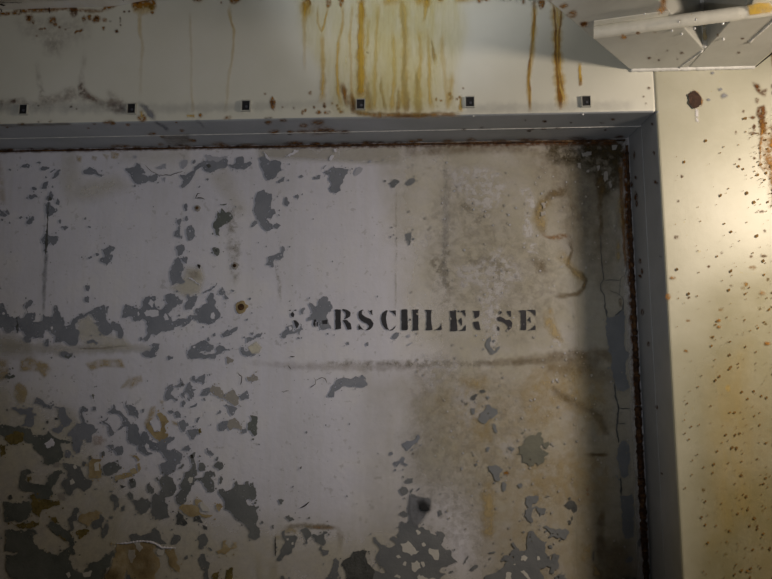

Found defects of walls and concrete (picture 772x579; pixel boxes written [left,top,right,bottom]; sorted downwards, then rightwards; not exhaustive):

peeling [180,150,299,188]
peeling [251,190,299,231]
rust [266,2,462,135]
rust [553,4,576,104]
rust [735,84,772,185]
peeling [0,199,262,368]
water stain [0,384,384,579]
peeling [0,371,577,579]
peeling [279,296,333,343]
rust [0,129,650,579]
water stain [419,140,636,579]
crack [614,383,630,443]